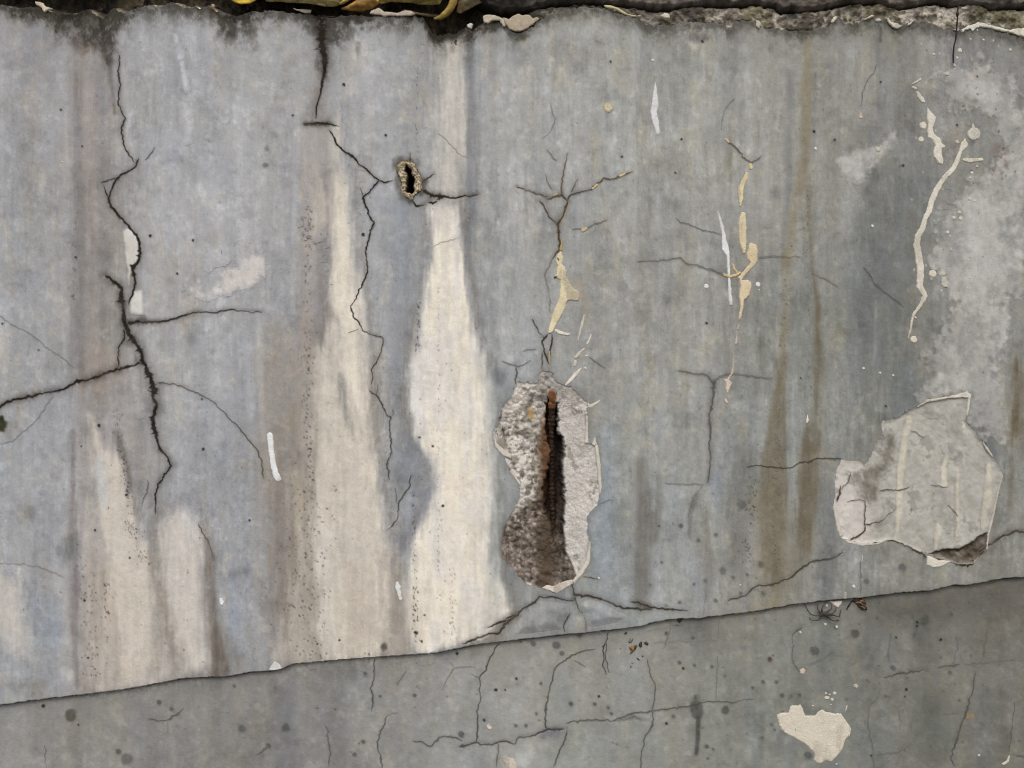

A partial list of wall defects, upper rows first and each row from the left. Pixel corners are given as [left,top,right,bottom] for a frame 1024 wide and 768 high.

crack [0,55,264,514]
damp [55,408,237,712]
crack [304,15,411,530]
damp [264,32,522,679]
crack [409,153,478,208]
crack [438,133,468,158]
crack [0,552,1024,768]
corrosion [526,389,559,502]
spalling [494,370,602,594]
crack [502,103,633,384]
peeling [777,705,851,765]
peeling [833,45,1024,568]